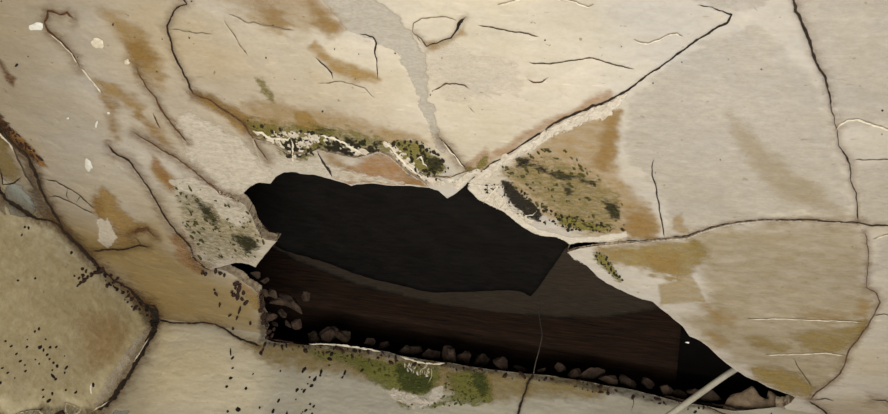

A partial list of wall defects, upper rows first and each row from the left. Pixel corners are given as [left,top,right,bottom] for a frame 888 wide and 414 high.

crack [412,16,538,47]
water stain [310,43,378,80]
corrosion [0,115,43,162]
water stain [198,95,277,131]
water stain [282,112,422,185]
crack [440,5,732,180]
crack [627,0,888,414]
crack [0,130,259,414]
peeling [90,337,149,411]
peeling [311,343,381,352]
peeling [385,356,444,409]
water stain [251,342,605,400]